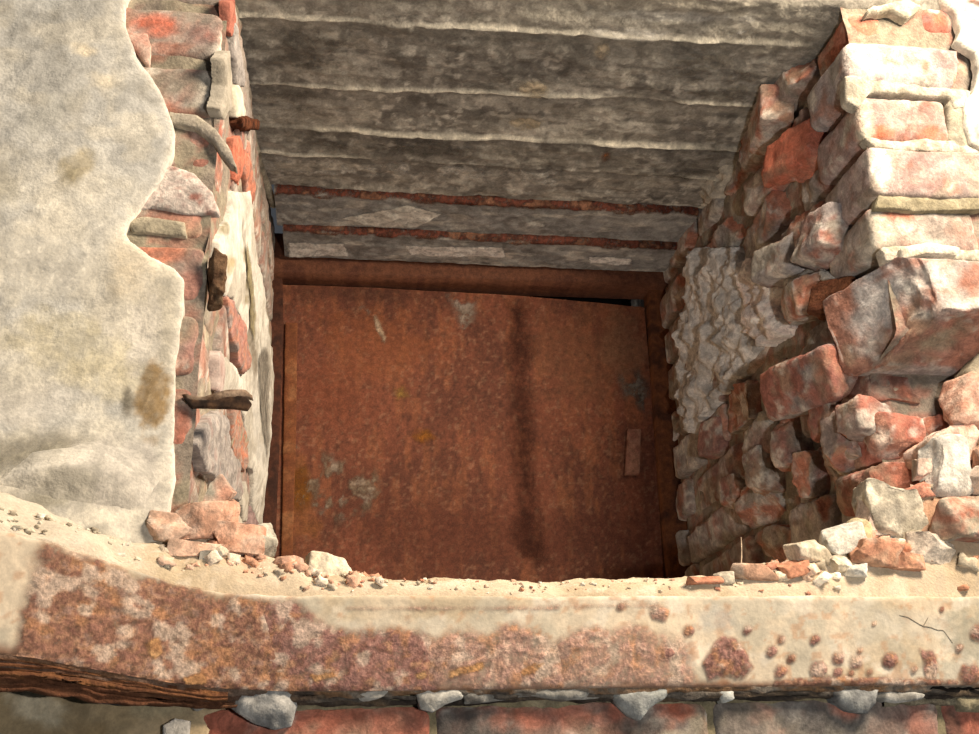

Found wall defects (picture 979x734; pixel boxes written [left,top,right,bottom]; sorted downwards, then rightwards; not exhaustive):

spalling [126,0,274,524]
rust [283,224,678,250]
rust [275,184,699,217]
spalling [660,0,979,577]
rust [0,543,979,709]
crack [930,686,979,694]